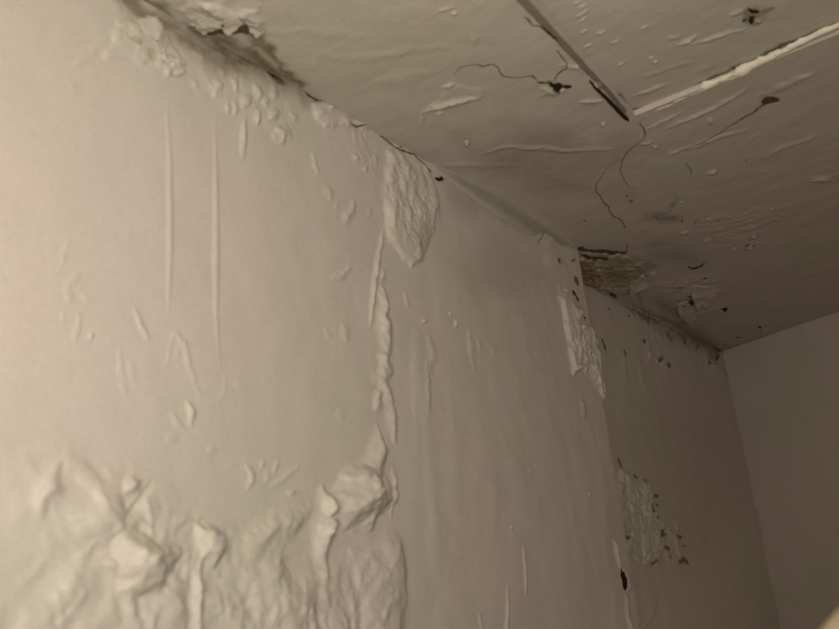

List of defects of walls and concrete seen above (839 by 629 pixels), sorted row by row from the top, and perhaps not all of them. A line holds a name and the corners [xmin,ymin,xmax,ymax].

peeling [66,0,189,94]
peeling [161,0,273,39]
water stain [209,34,303,87]
crack [589,80,646,229]
peeling [528,233,653,399]
peeling [612,538,634,629]